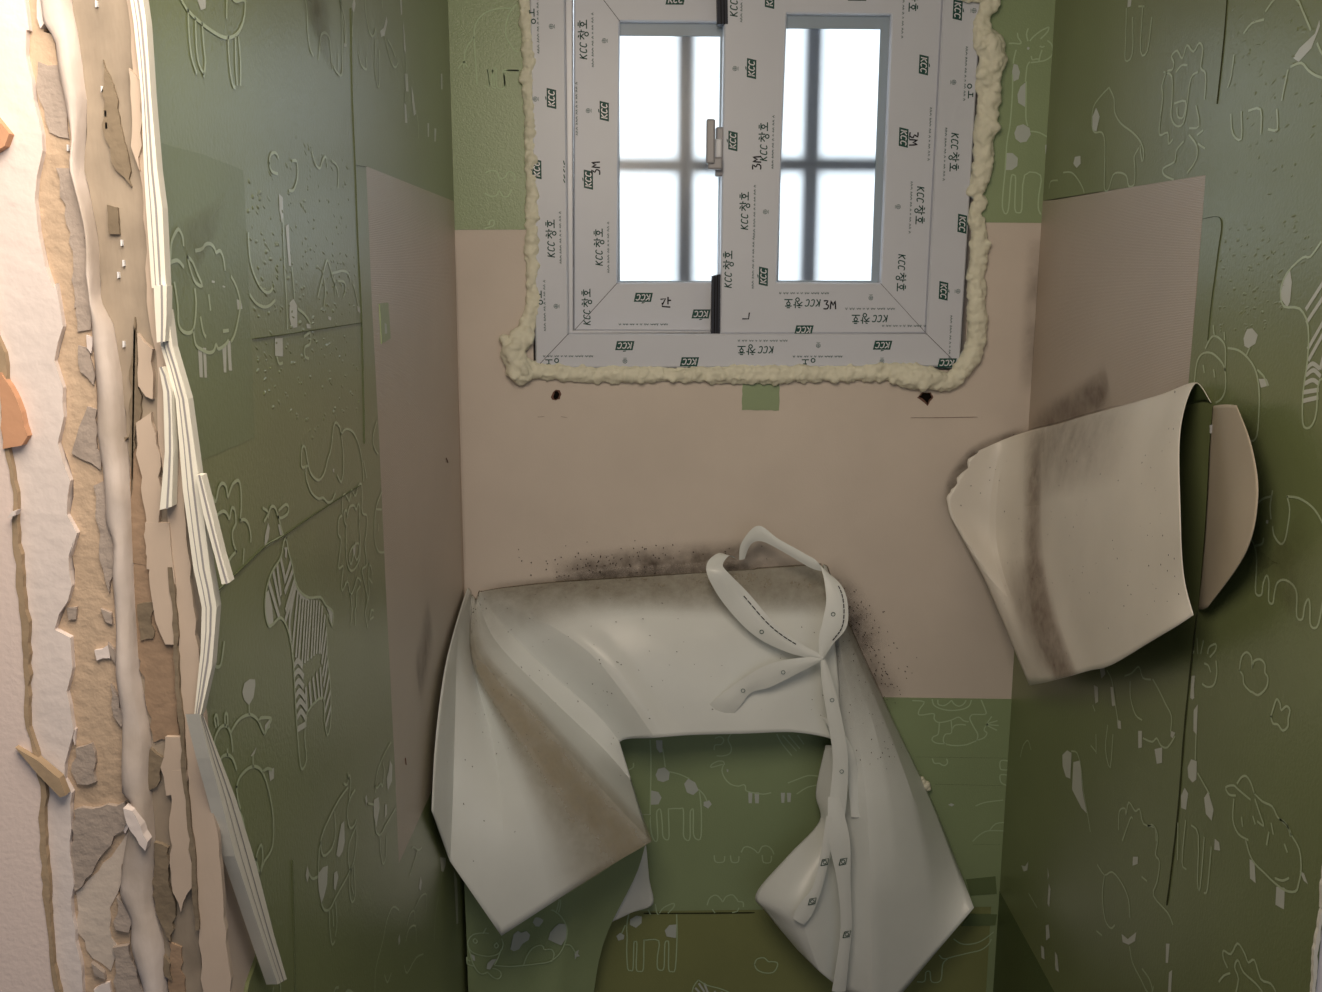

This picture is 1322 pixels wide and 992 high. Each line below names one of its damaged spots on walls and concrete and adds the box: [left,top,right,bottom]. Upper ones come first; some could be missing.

flaking render [0,0,287,992]
damp [502,544,714,609]
damp [725,548,917,699]